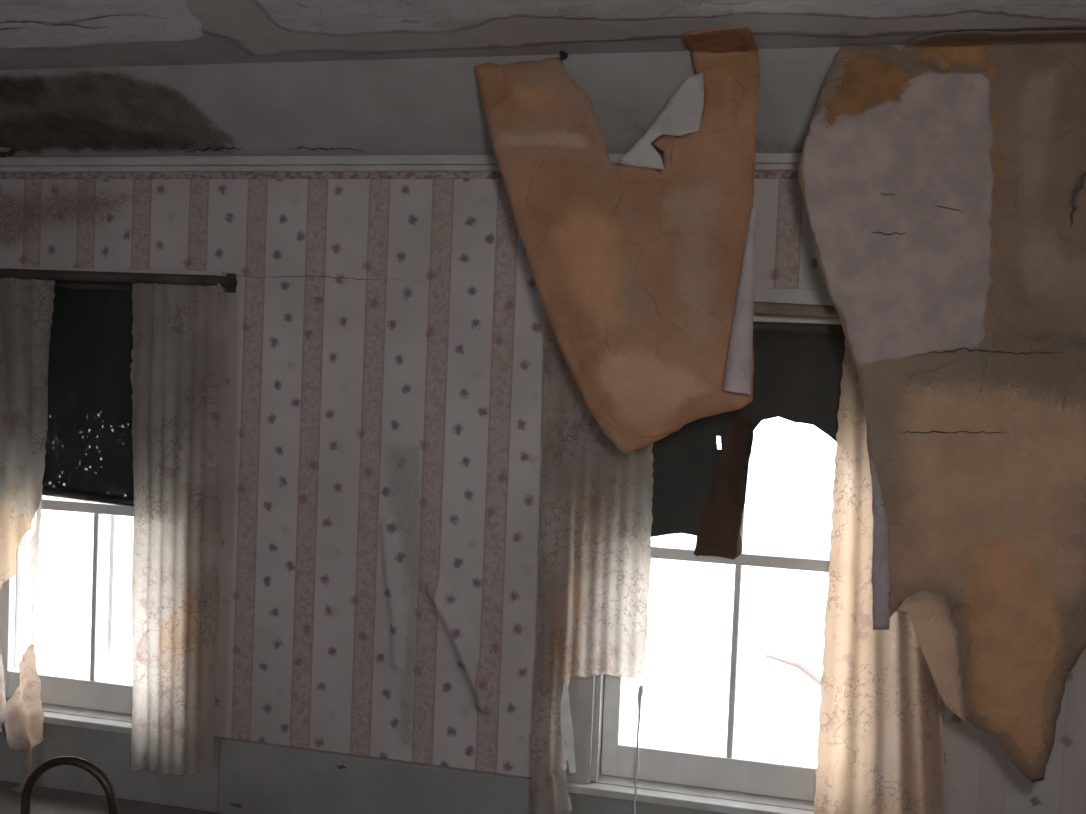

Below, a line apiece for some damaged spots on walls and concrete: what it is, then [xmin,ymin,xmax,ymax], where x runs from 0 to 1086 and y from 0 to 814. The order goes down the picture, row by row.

spalling [0,143,20,157]
leakage [0,69,239,156]